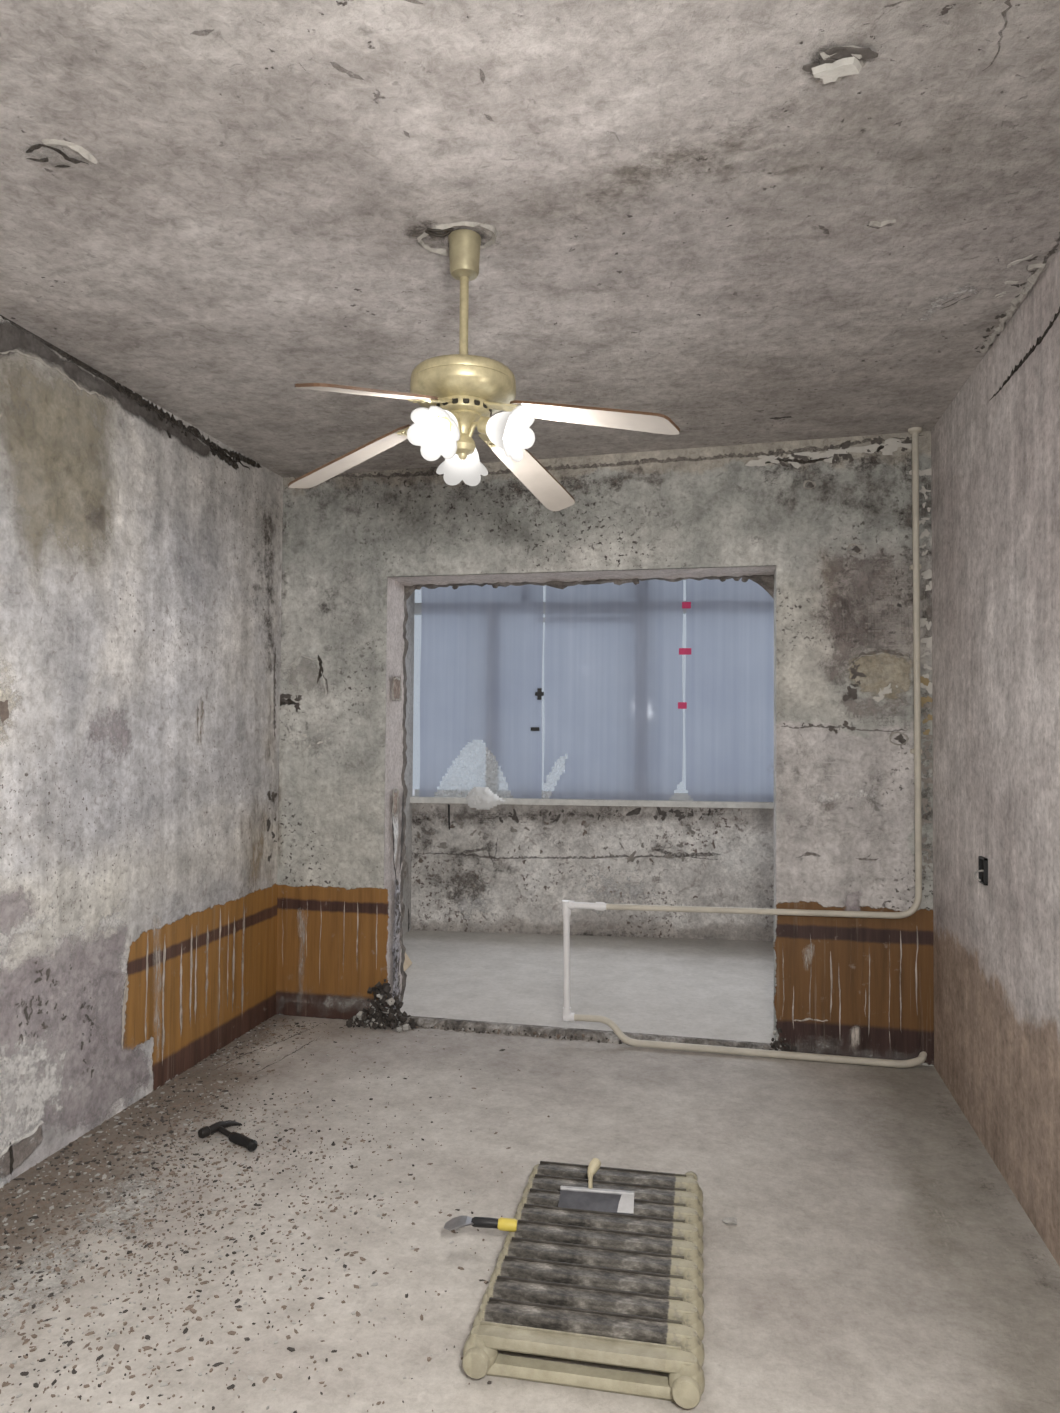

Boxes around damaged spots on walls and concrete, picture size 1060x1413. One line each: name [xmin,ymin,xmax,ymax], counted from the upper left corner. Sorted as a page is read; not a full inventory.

spalling [802,45,879,84]
crack [983,0,1012,71]
flaking render [0,321,211,457]
damp [0,357,109,560]
damp [566,466,662,491]
peeling [0,666,19,740]
damp [778,456,933,879]
peeling [842,649,912,745]
peeling [15,961,148,1094]
flaking render [0,1120,44,1188]